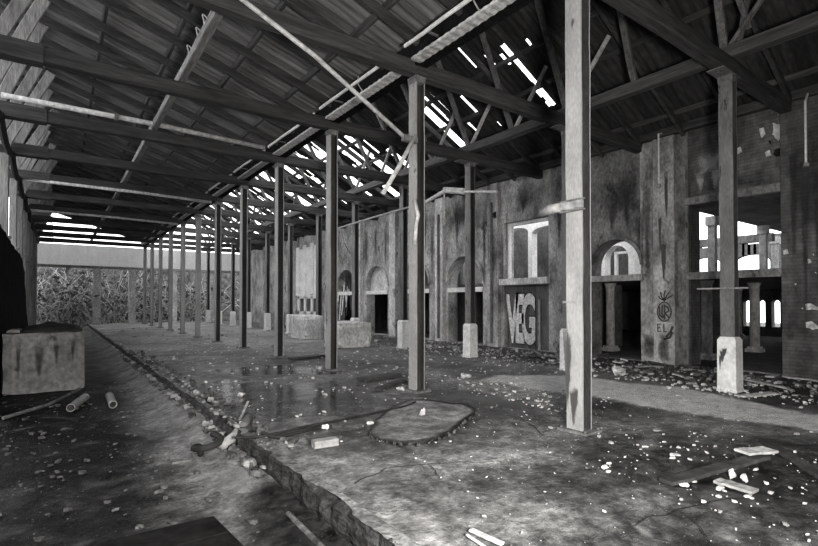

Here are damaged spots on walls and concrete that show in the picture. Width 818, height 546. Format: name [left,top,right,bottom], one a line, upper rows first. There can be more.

flaking render [759,123,780,141]